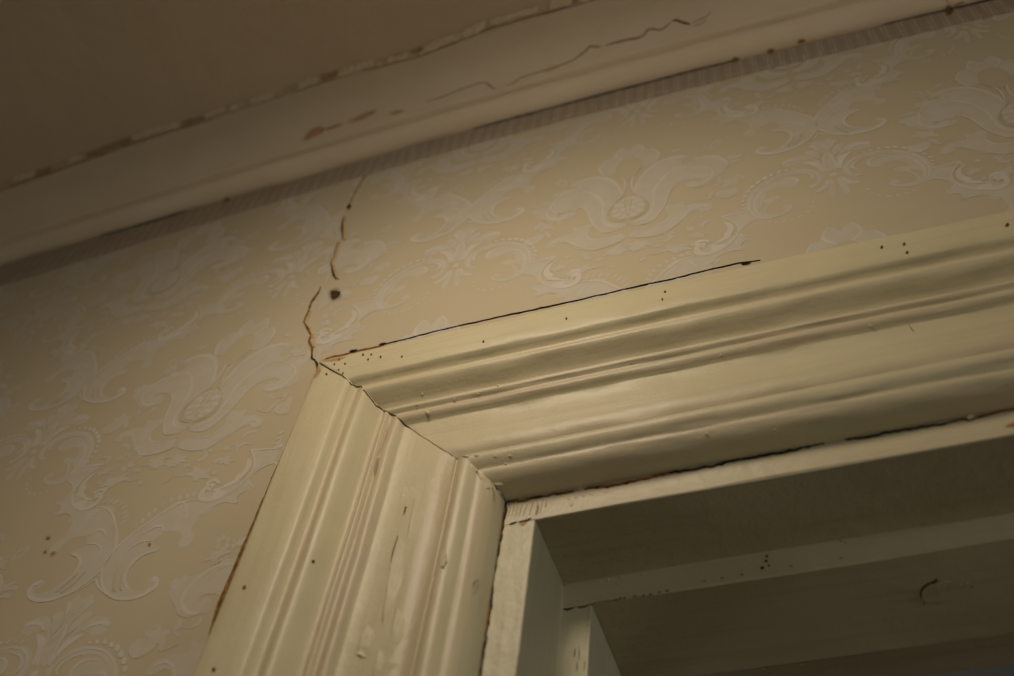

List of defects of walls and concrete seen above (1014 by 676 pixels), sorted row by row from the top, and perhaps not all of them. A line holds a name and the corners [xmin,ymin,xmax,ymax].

crack [427,11,711,102]
crack [303,175,453,456]
crack [349,260,760,352]
crack [480,408,1014,676]